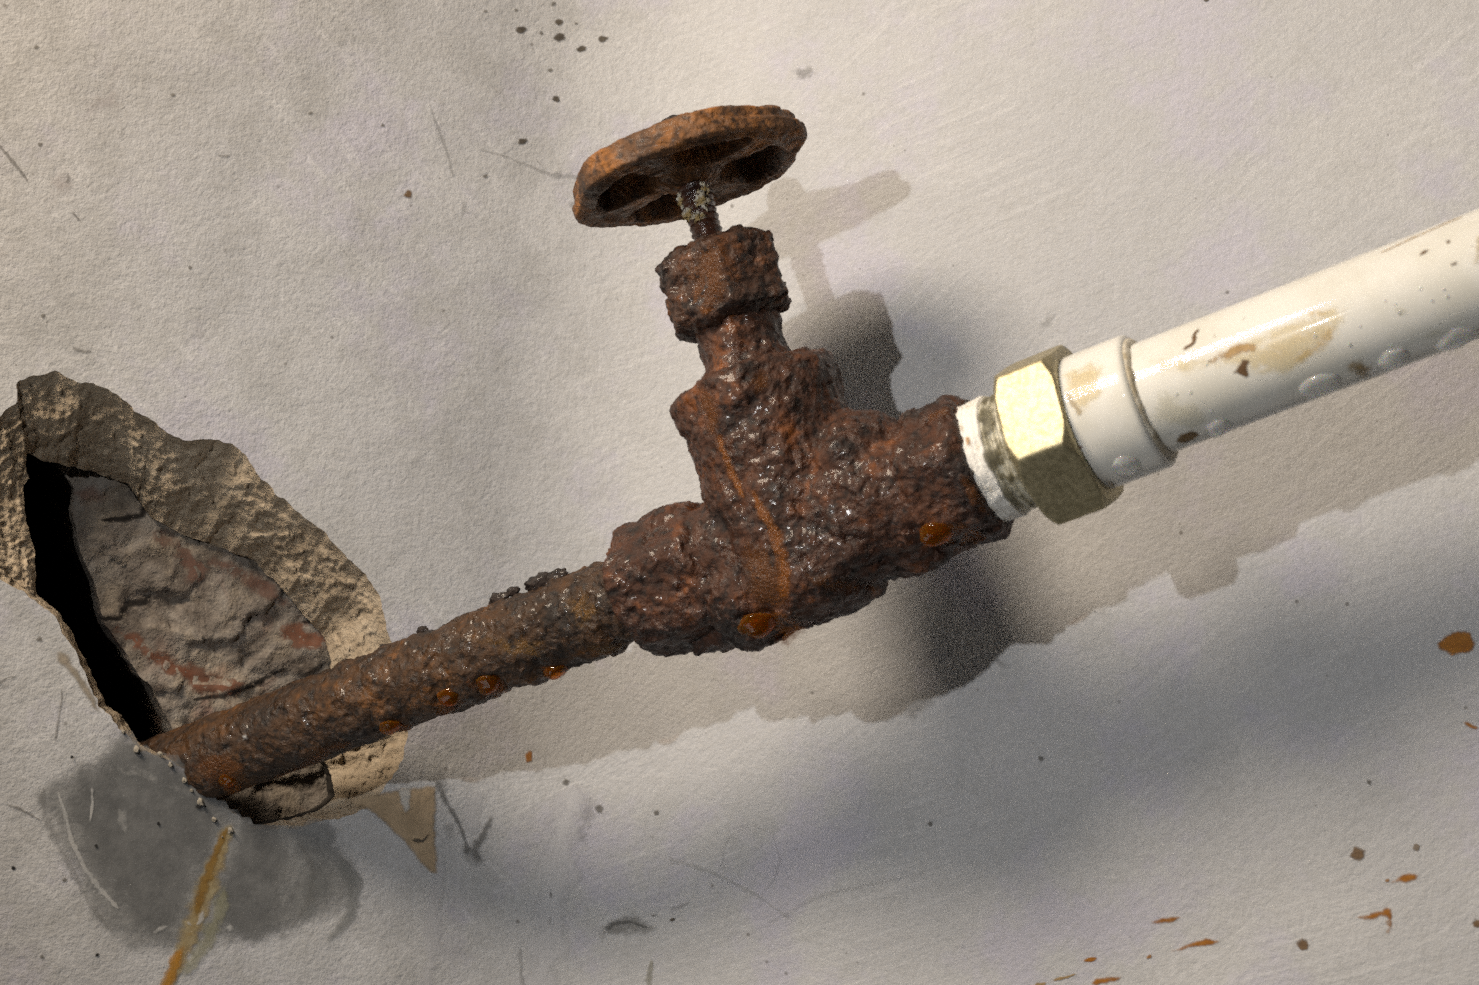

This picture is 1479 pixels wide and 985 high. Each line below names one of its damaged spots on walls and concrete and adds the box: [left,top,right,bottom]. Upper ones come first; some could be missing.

spalling [0,371,436,872]
rust [1438,632,1474,655]
water stain [80,753,209,928]
rust [161,829,231,985]
rust [1036,957,1119,985]
rust [1180,939,1216,950]